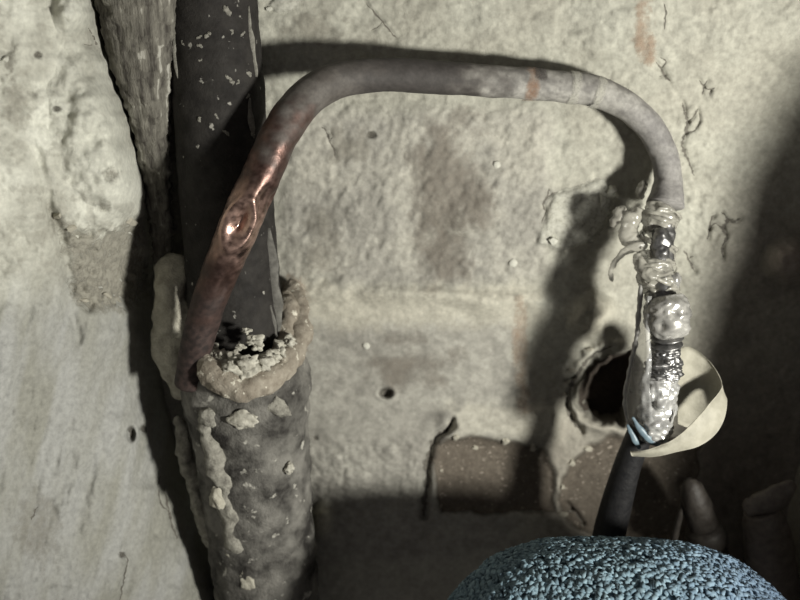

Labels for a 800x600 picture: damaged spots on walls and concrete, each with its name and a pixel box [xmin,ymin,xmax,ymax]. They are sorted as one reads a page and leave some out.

crack [656,57,671,82]
crack [681,80,716,176]
water stain [419,128,485,278]
crack [707,213,740,258]
spalling [579,352,641,415]
spalling [432,434,624,533]
spalling [626,438,701,540]